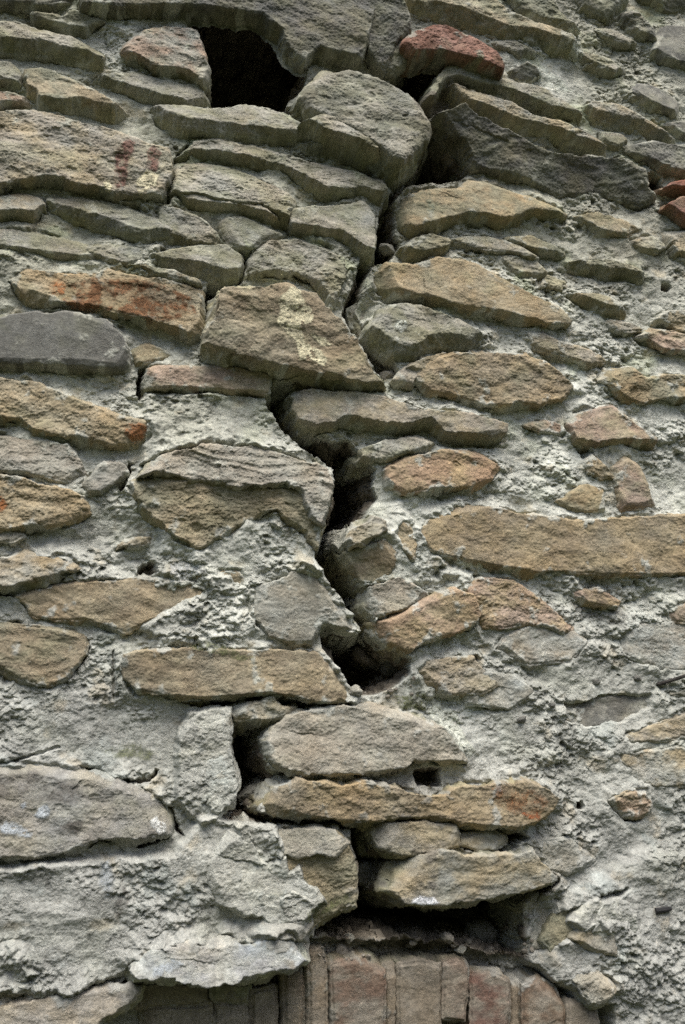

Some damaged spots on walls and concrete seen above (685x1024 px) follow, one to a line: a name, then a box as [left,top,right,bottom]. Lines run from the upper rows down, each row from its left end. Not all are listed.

crack [393,73,436,101]
crack [341,149,470,380]
crack [265,400,378,559]
crack [315,578,418,705]
crack [180,696,350,830]